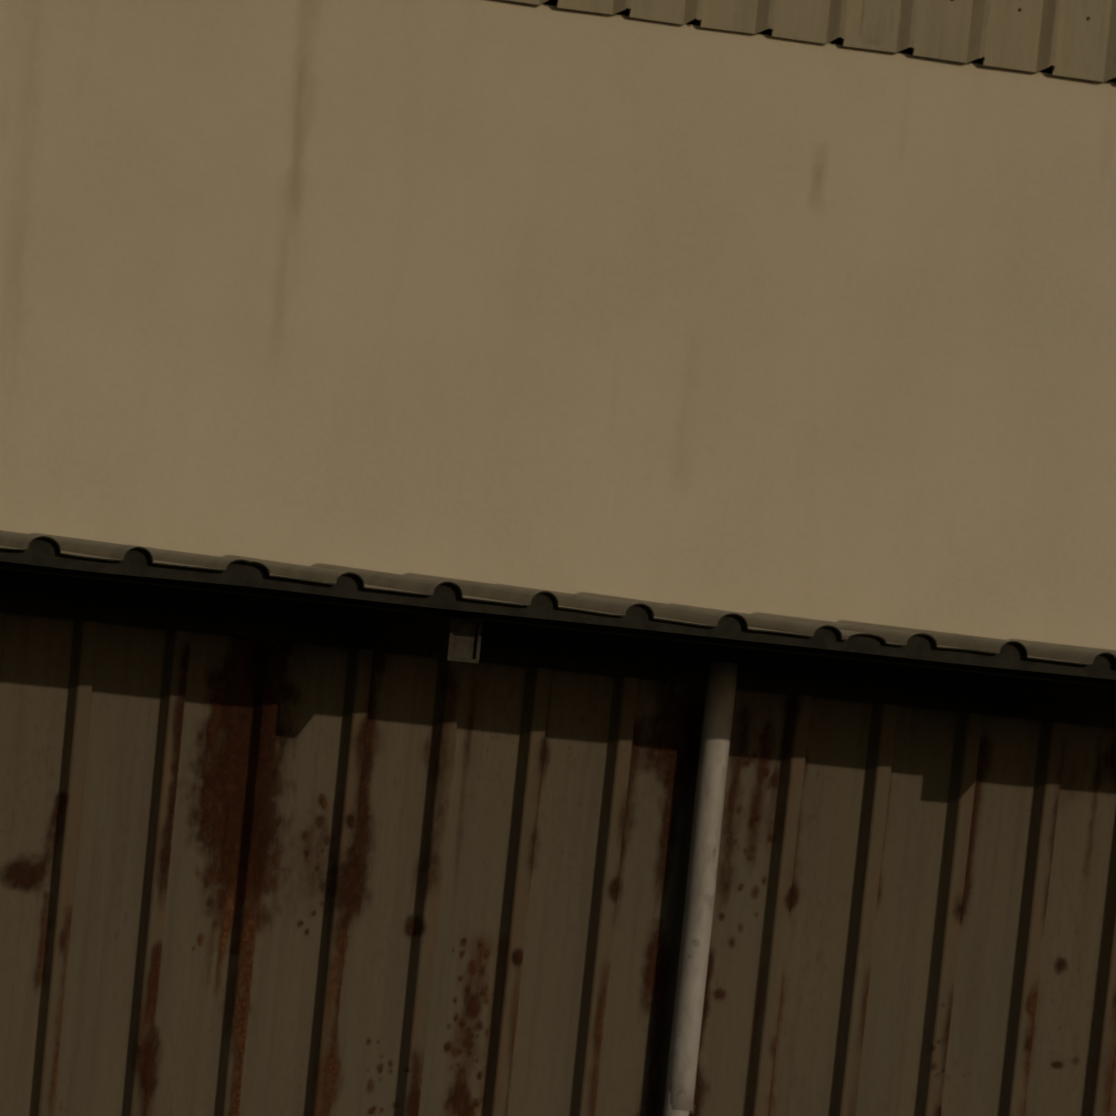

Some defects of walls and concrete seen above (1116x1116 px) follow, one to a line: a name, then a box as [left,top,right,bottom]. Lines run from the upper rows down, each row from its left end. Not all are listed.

corrosion [4,793,68,985]
corrosion [160,644,190,892]
corrosion [316,650,387,1116]
corrosion [620,681,701,889]
corrosion [722,700,800,897]
corrosion [139,943,162,1116]
corrosion [445,938,523,1116]
corrosion [644,929,669,1116]
corrosion [689,949,726,1116]